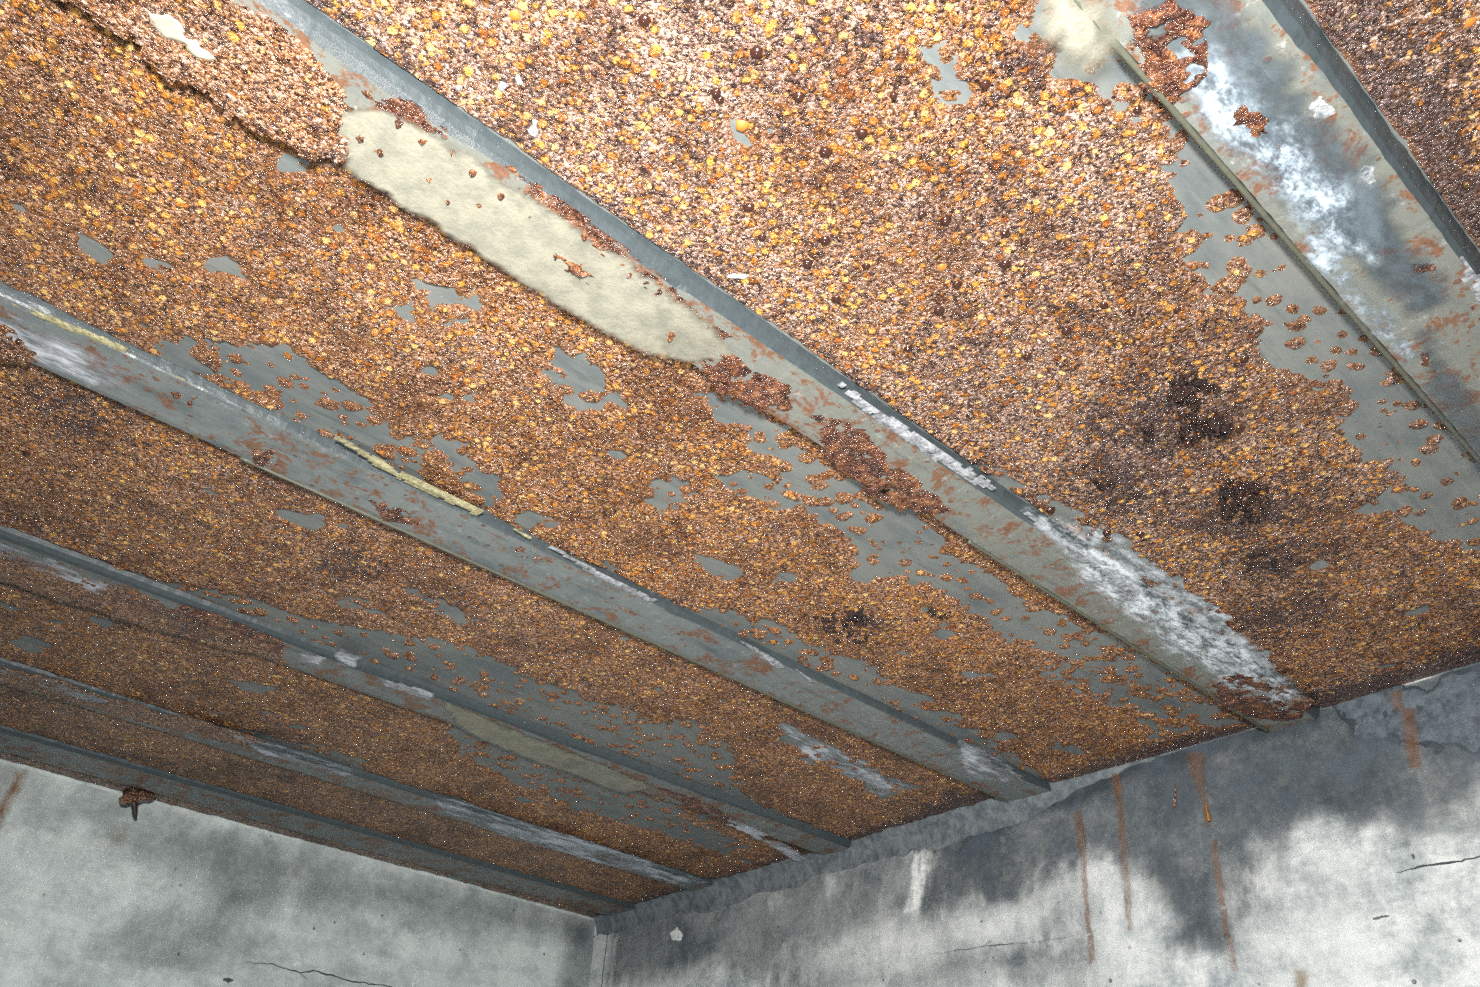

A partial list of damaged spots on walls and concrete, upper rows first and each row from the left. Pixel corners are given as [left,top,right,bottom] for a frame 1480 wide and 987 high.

peeling [338,111,732,360]
damp [1189,61,1413,357]
peeling [10,303,128,353]
peeling [334,435,484,516]
corrosion [0,0,1480,783]
peeling [837,382,996,491]
corrosion [0,324,995,918]
peeling [548,546,657,603]
peeling [739,641,815,682]
damp [1039,518,1298,702]
damp [925,662,1480,946]
crack [1396,856,1480,873]